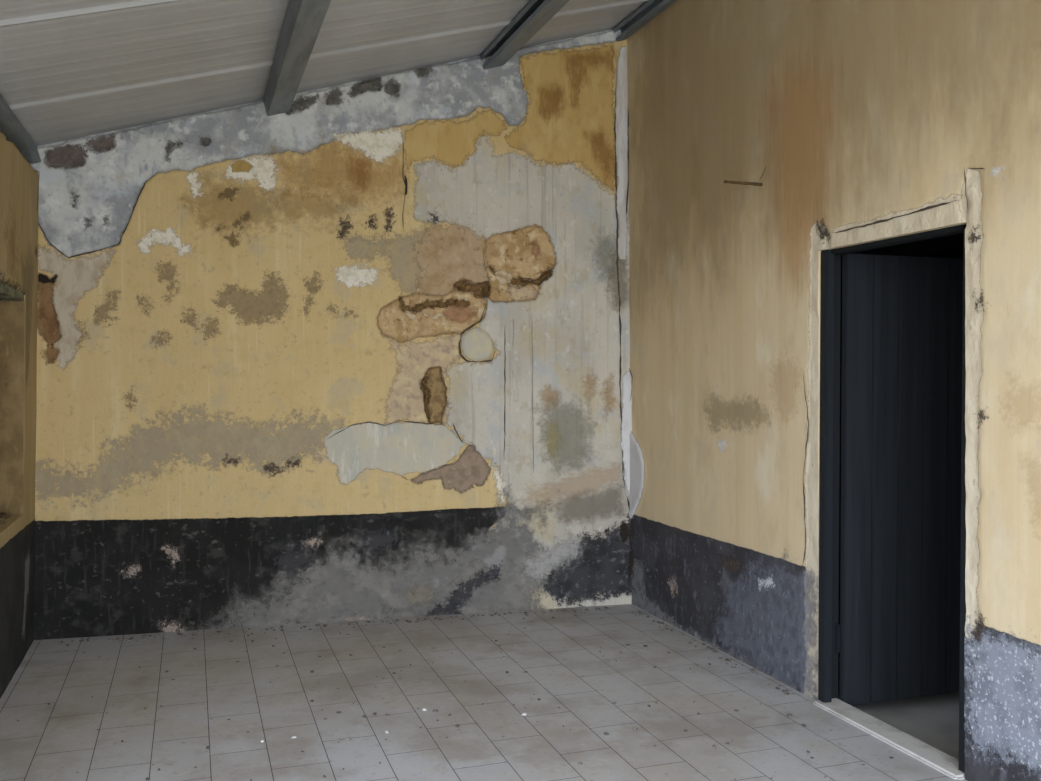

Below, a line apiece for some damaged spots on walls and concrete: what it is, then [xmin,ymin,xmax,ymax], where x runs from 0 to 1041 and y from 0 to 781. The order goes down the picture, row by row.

flaking render [30,29,622,370]
water stain [22,552,30,634]
water stain [35,407,344,506]
peeling [211,46,1041,780]